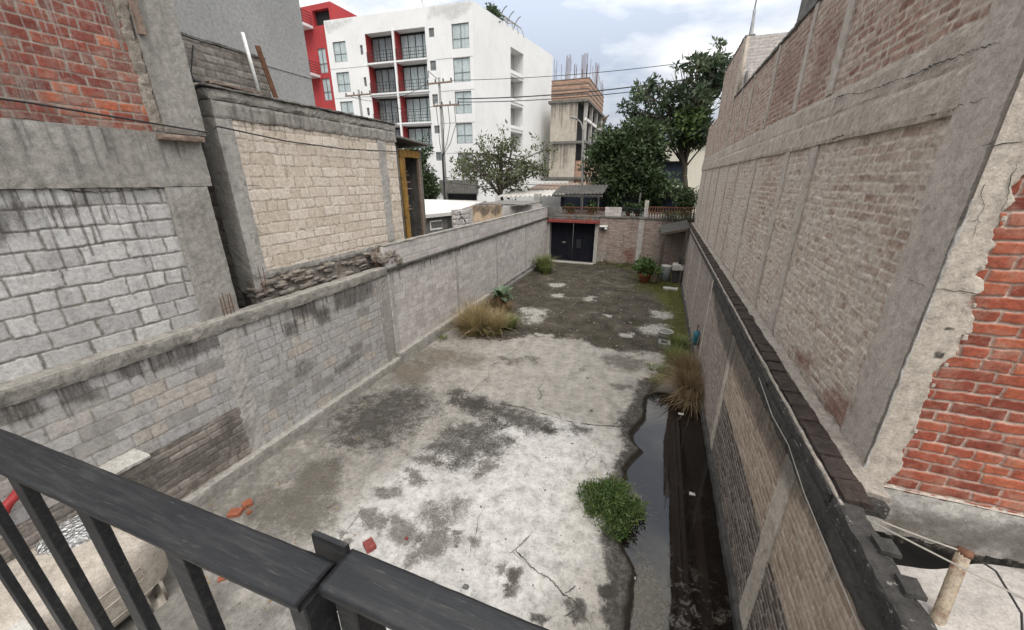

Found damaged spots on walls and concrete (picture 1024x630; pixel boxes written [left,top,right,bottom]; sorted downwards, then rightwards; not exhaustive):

crack [828,42,1001,102]
leakage [0,189,99,271]
crack [972,142,1020,239]
leakage [117,338,220,378]
spalling [863,199,974,468]
flaking render [884,175,1024,518]
crack [510,533,591,625]